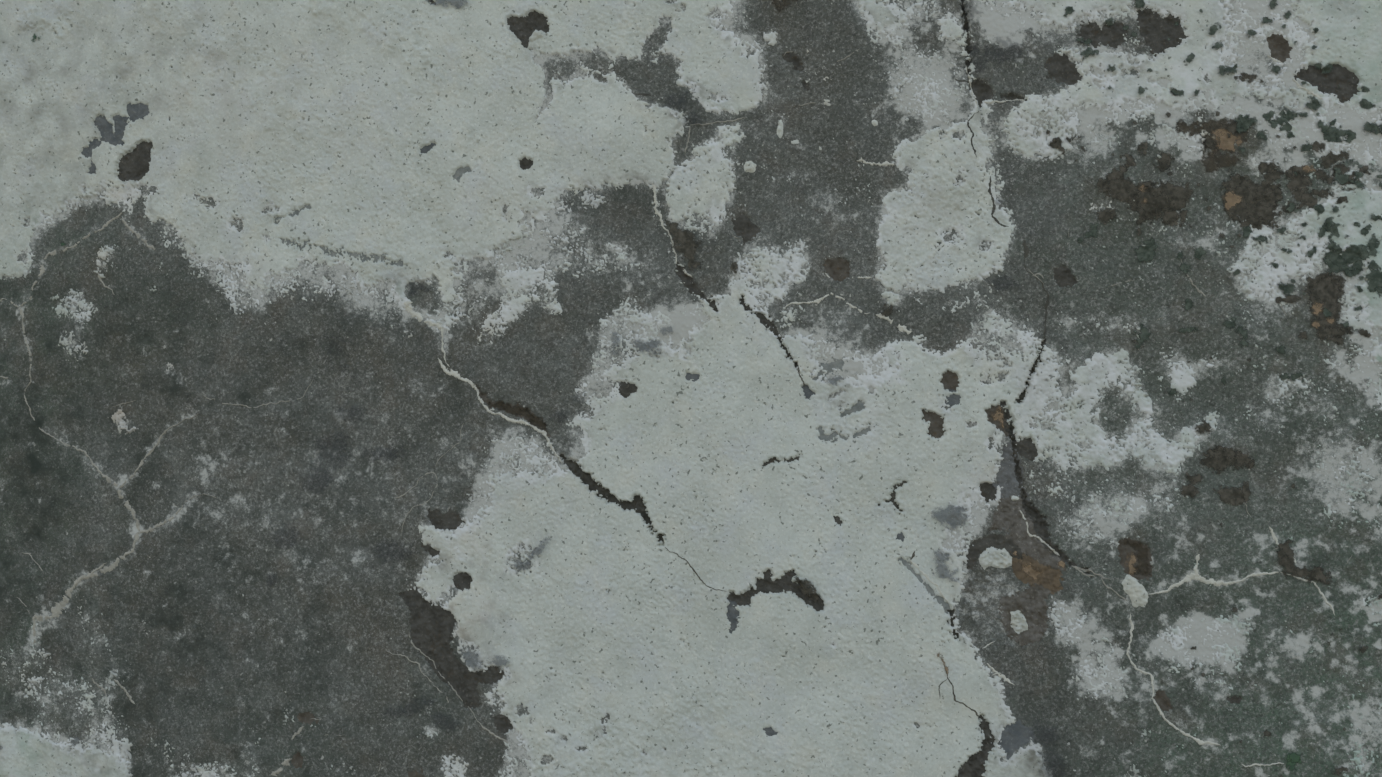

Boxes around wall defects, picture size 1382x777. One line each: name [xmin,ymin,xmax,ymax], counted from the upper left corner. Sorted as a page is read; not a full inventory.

spalling [507,10,549,51]
water stain [1199,9,1281,83]
water stain [1248,0,1339,86]
spalling [117,141,153,181]
rust [1176,113,1249,173]
water stain [1077,81,1382,345]
rust [1224,191,1243,210]
crack [274,204,727,592]
crack [955,0,1335,767]
spalling [399,572,509,708]
spalling [717,569,826,634]
crack [898,551,1014,777]